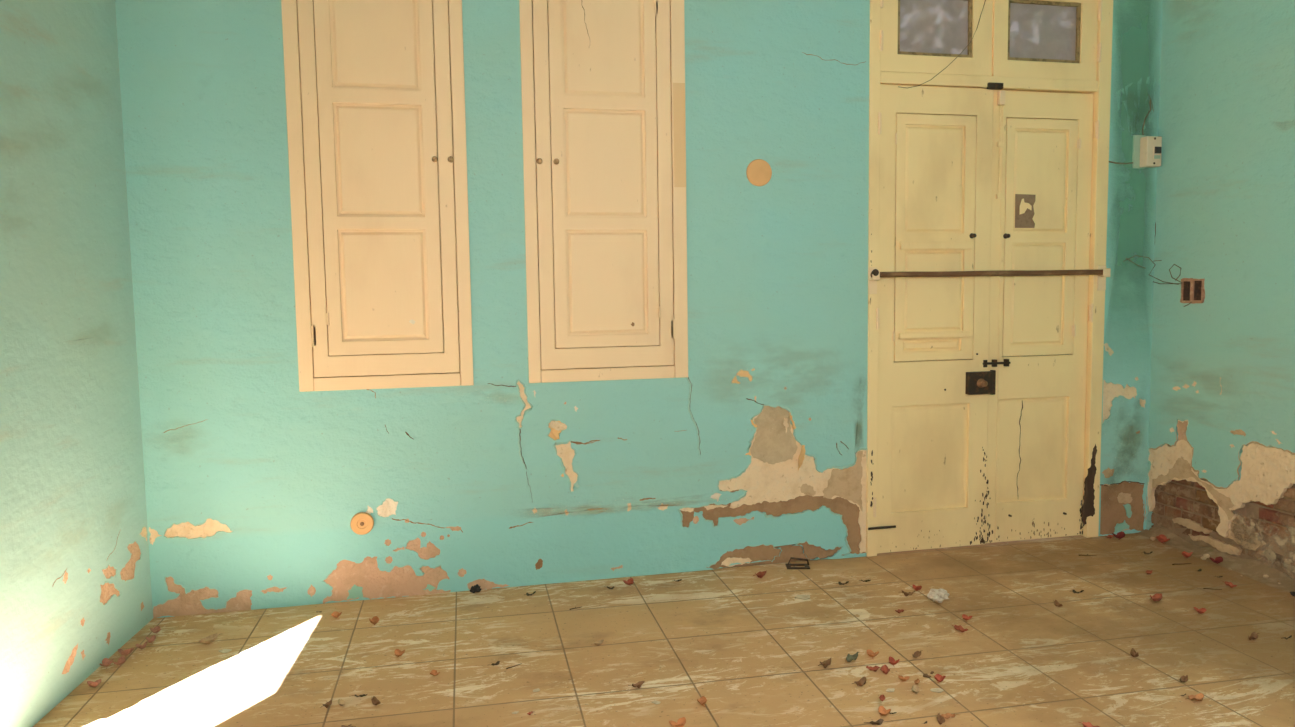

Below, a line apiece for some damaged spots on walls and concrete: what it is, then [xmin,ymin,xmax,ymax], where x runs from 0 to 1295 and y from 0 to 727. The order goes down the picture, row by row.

peeling [515,379,536,429]
crack [675,377,701,455]
spalling [1102,377,1146,424]
peeling [547,419,580,492]
spalling [658,368,873,569]
flaking render [1146,420,1295,578]
spalling [87,518,233,606]
peeling [141,575,287,618]
peeling [308,498,509,603]
peeling [62,644,86,674]